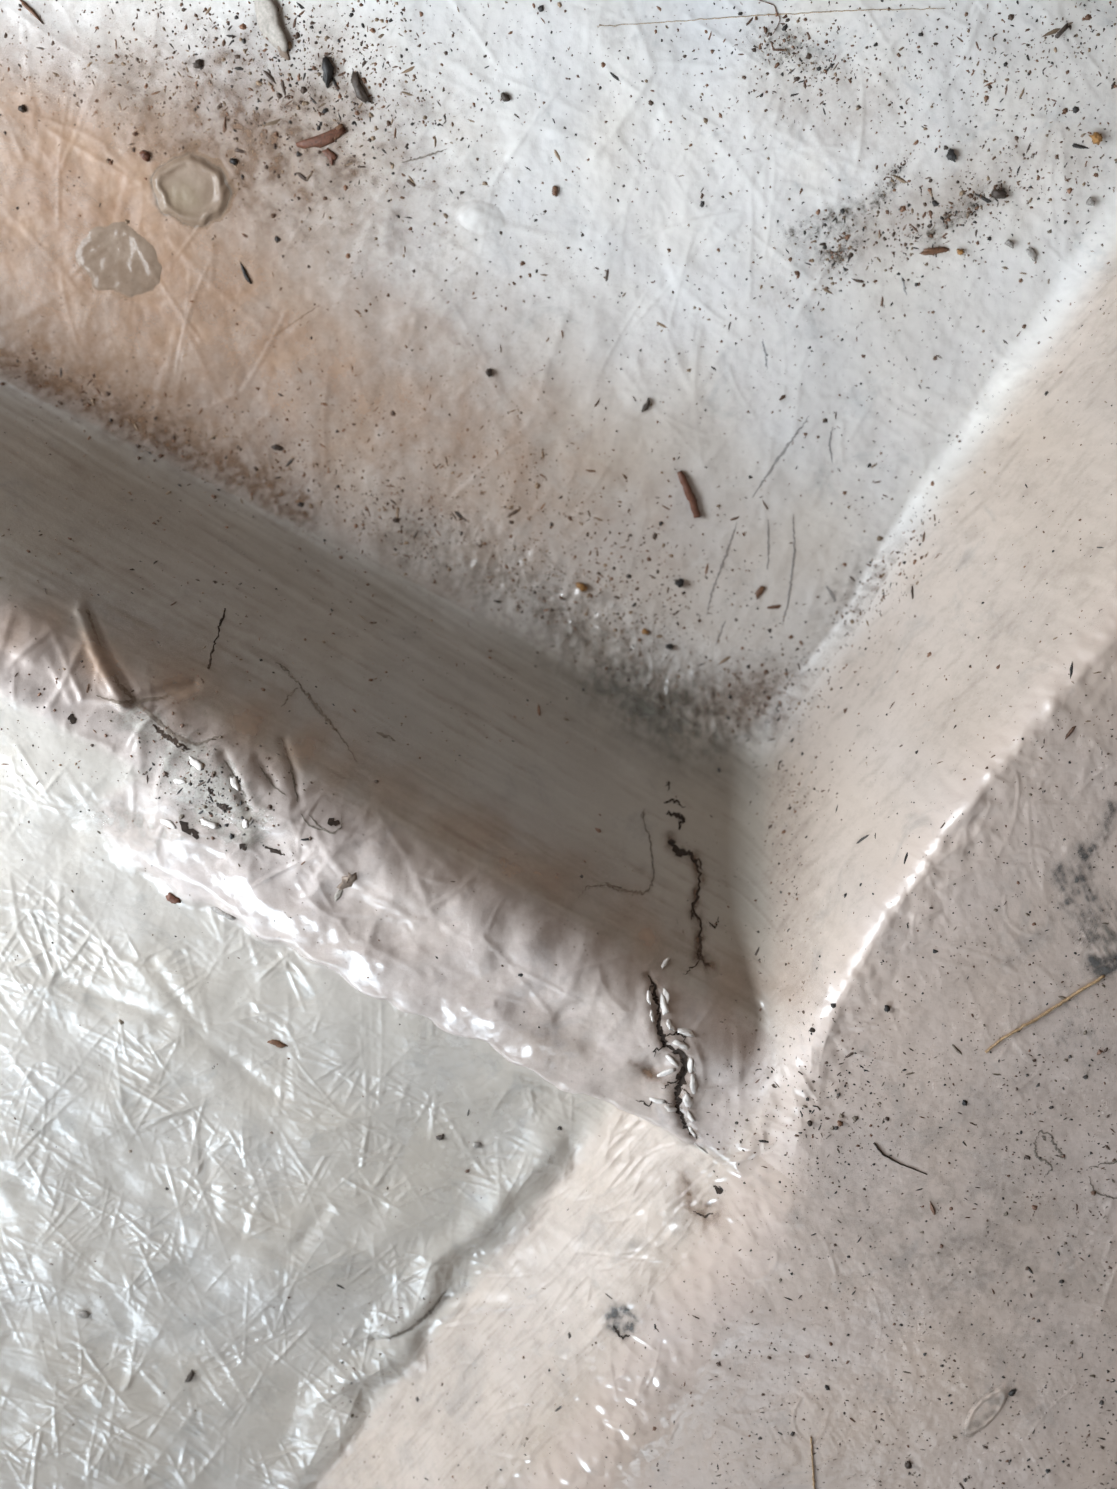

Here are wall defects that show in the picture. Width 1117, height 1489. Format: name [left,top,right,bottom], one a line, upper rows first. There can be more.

crack [578,781,719,1153]